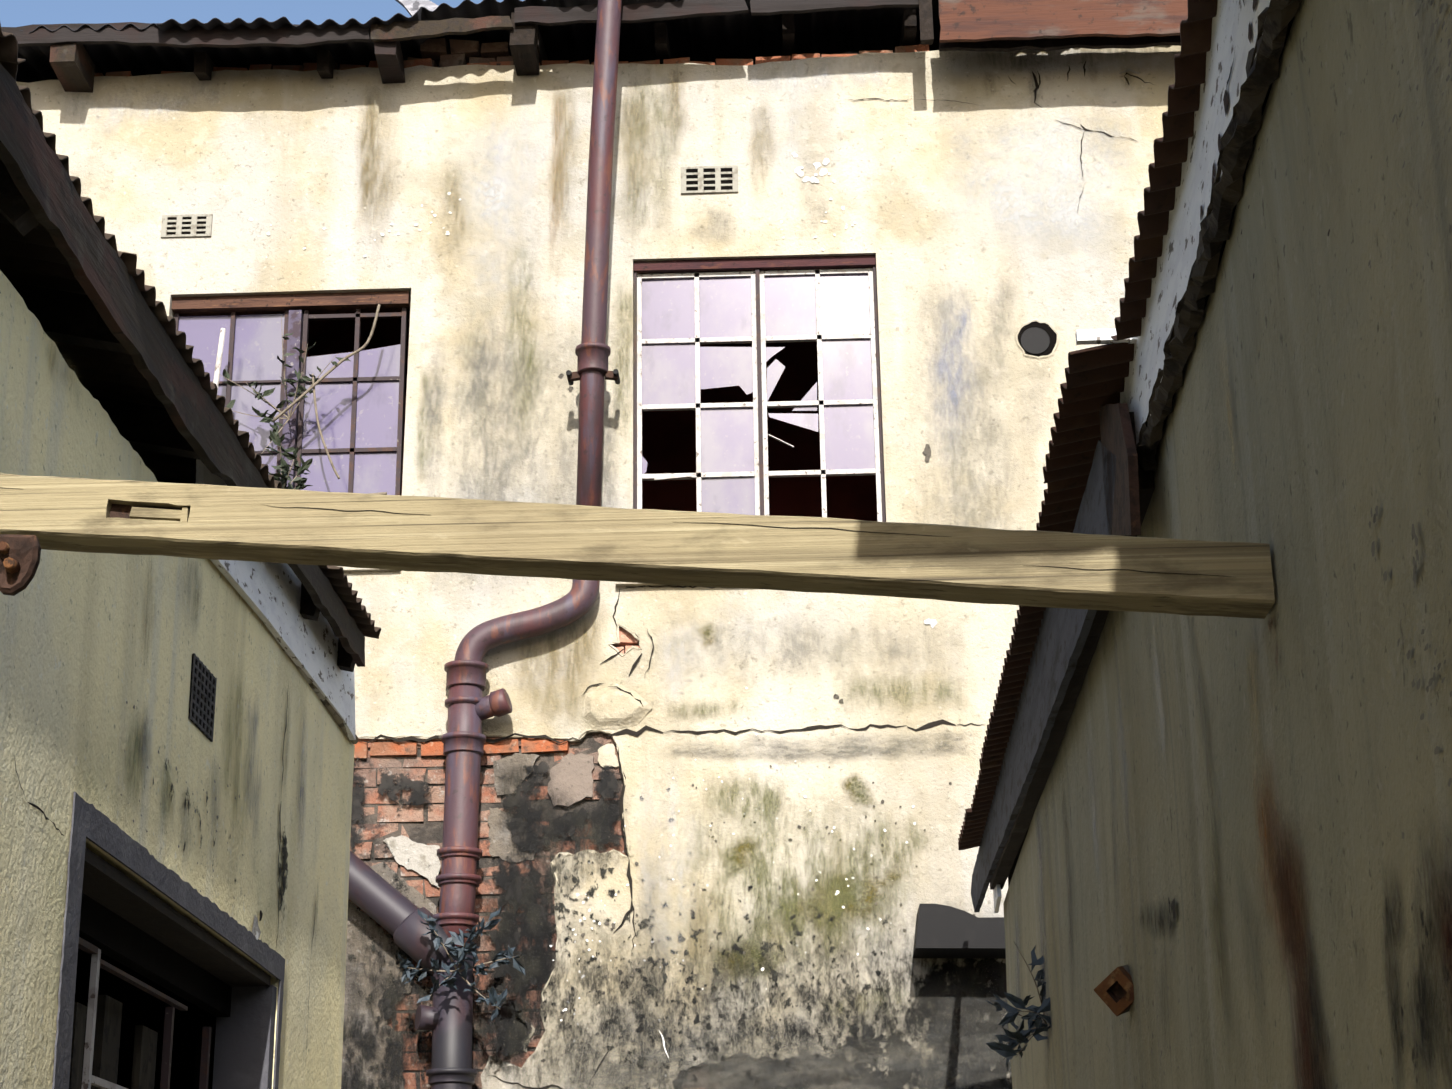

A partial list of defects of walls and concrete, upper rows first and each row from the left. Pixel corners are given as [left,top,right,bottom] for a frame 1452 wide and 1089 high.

crack [1008,61,1154,214]
spalling [608,623,642,657]
crack [359,734,442,743]
water stain [278,831,288,911]
spalling [341,901,413,1089]
spalling [370,835,441,915]
spalling [481,728,661,1077]
crack [486,719,983,949]
water stain [472,761,1018,1089]
spalling [825,799,926,881]